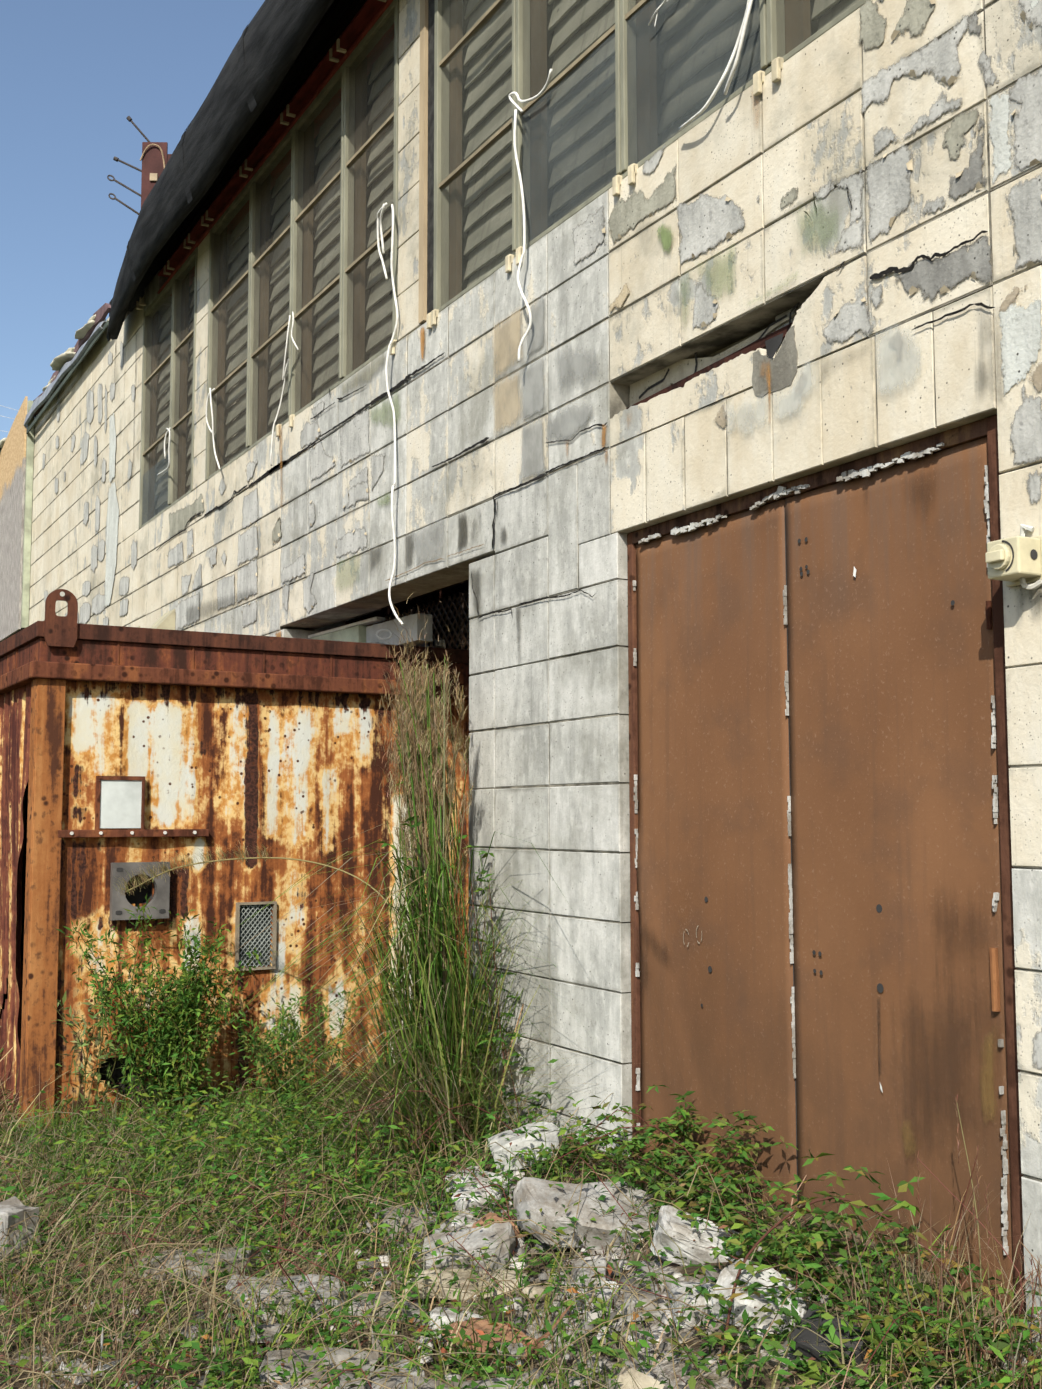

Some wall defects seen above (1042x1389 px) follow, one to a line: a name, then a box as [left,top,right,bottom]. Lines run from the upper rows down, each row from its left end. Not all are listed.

peeling [1018,0,1042,35]
peeling [572,144,759,266]
peeling [693,282,720,329]
spalling [752,325,798,397]
peeling [780,0,988,257]
peeling [823,235,993,343]
crack [837,231,988,279]
peeling [978,51,1042,270]
peeling [42,341,137,625]
peeling [1010,385,1042,504]
peeling [167,459,282,630]